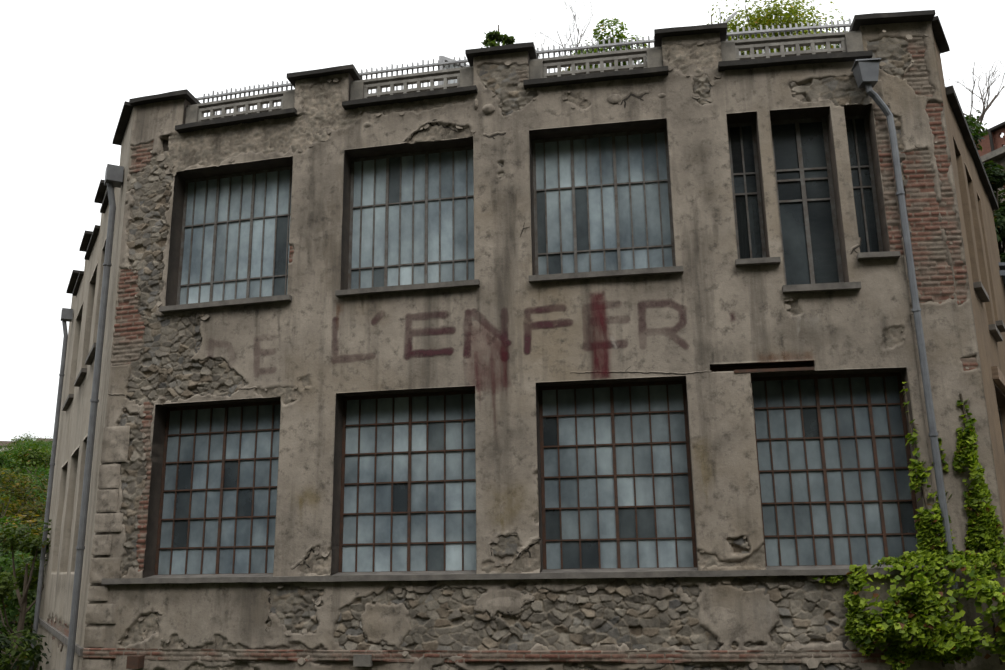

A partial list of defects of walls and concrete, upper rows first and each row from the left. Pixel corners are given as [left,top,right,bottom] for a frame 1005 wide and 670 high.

peeling [477,61,538,116]
peeling [662,41,723,105]
flaking render [790,30,968,314]
flaking render [111,77,476,578]
peeling [118,613,189,649]
flaking render [187,583,333,670]
flaking render [334,535,860,657]
flaking render [657,658,860,670]